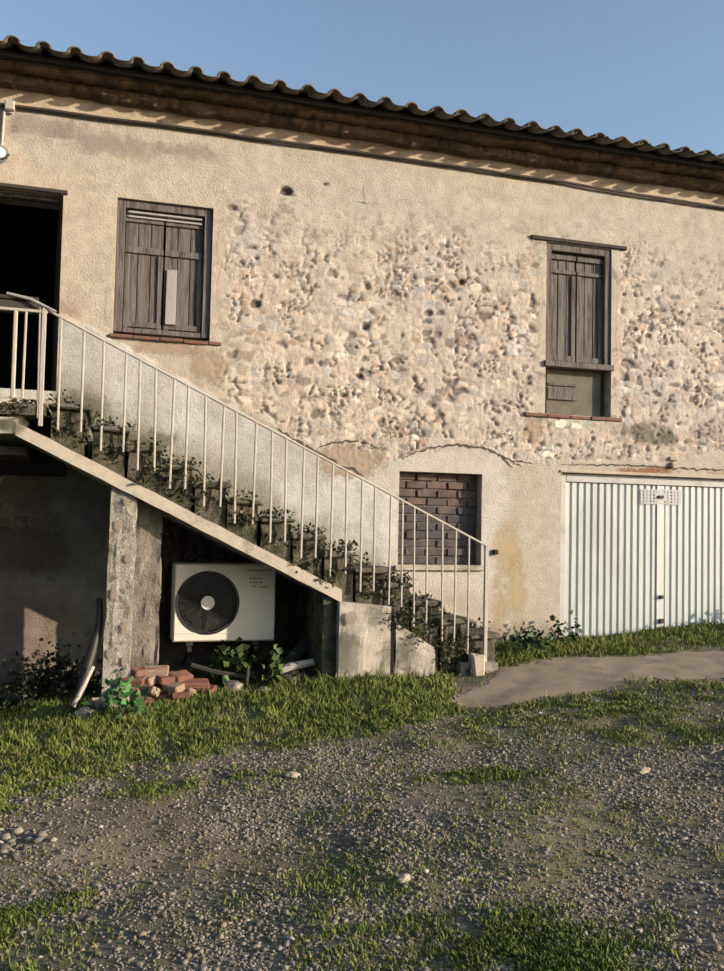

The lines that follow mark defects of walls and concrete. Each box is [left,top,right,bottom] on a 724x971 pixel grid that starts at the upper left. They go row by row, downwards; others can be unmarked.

peeling [329,299,369,330]
peeling [506,274,545,357]
peeling [615,288,639,369]
crack [278,428,532,477]
flaking render [524,417,570,458]
peeling [553,419,586,430]
crack [562,450,724,471]